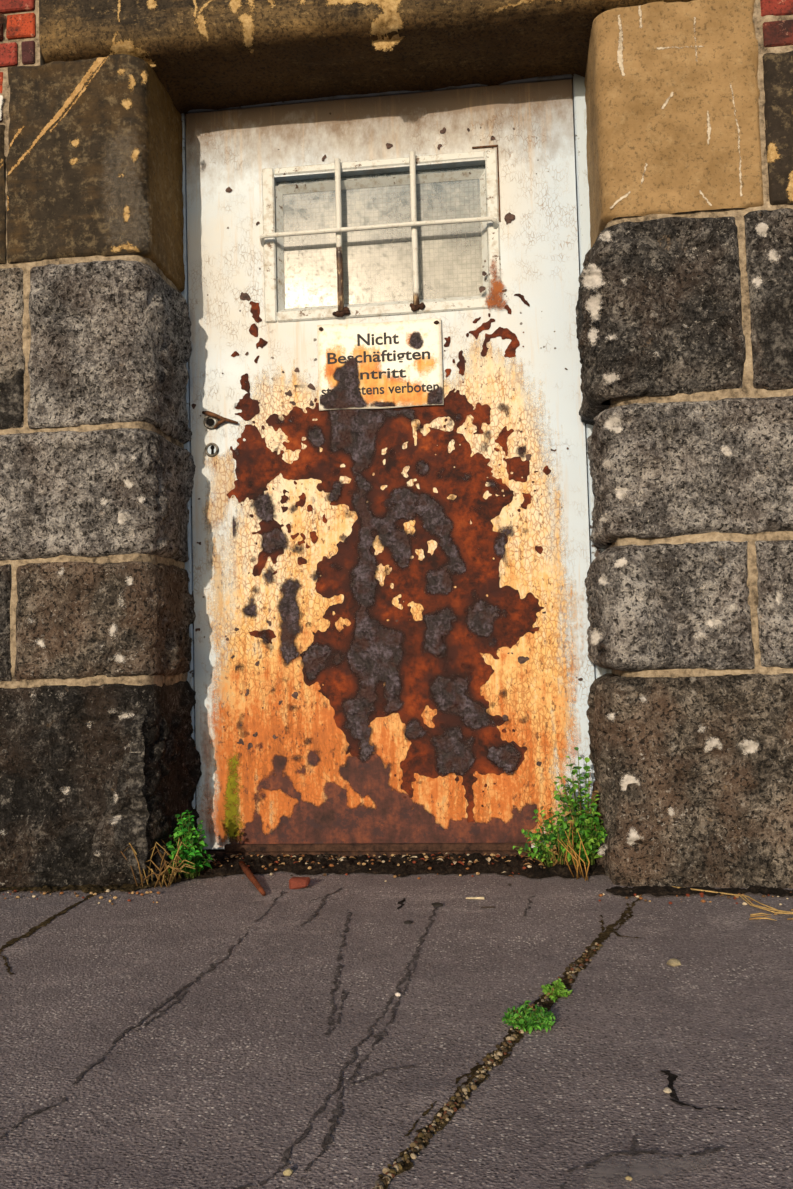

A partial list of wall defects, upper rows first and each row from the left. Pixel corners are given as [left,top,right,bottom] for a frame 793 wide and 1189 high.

corrosion [486,260,506,308]
peeling [501,281,530,314]
peeling [225,292,551,823]
corrosion [205,332,576,846]
crack [0,887,440,1189]
crack [372,898,640,1189]
crack [560,1131,726,1188]
crack [660,1070,734,1110]